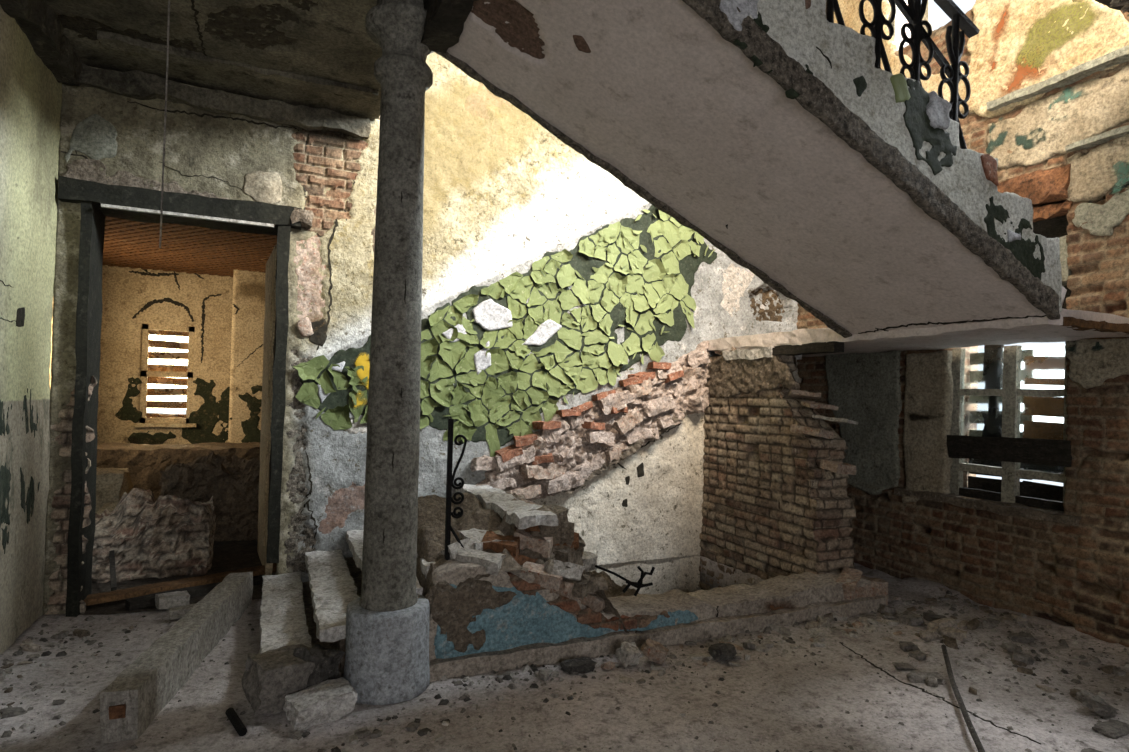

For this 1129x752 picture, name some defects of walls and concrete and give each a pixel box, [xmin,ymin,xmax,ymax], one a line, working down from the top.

spalling [573,35,591,53]
spalling [682,0,1129,335]
spalling [0,376,97,615]
peeling [115,377,262,445]
spalling [284,130,371,573]
peeling [420,205,796,668]